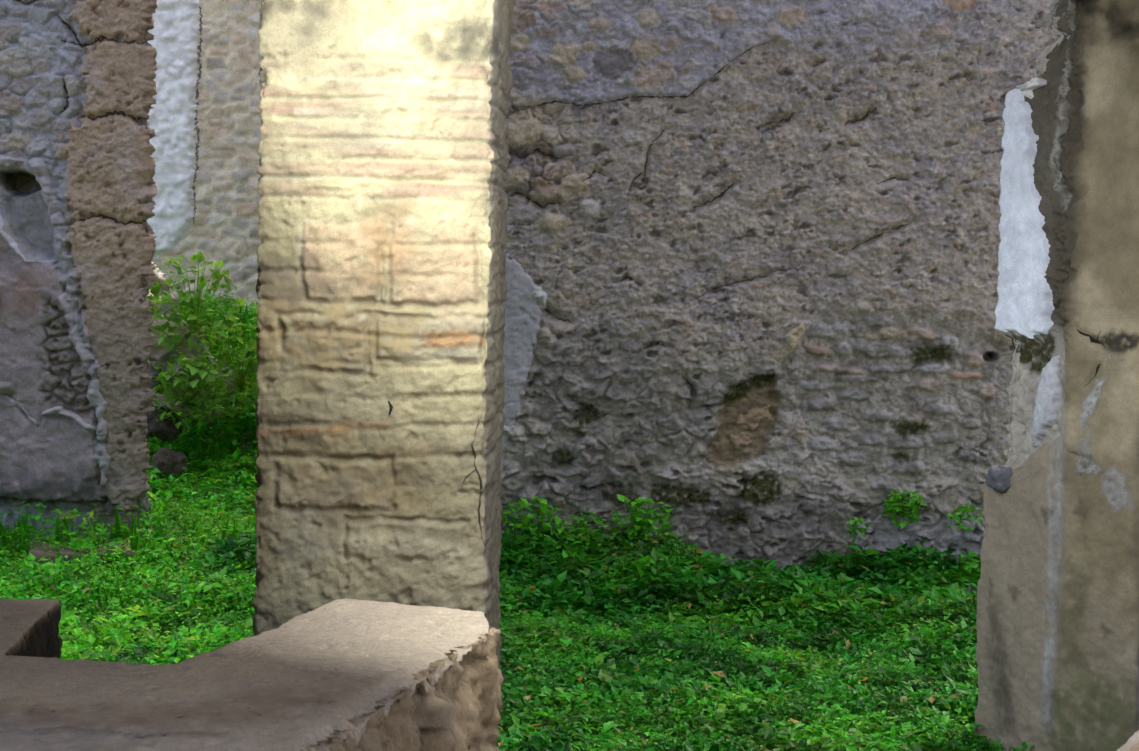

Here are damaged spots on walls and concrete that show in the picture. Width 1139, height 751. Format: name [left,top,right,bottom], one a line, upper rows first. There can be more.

crack [16,0,149,48]
crack [513,40,773,108]
crack [509,148,568,159]
crack [582,130,664,195]
crack [505,191,560,208]
crack [693,183,734,208]
flaking render [994,77,1055,339]
crack [697,265,800,298]
flaking render [0,153,111,486]
spalling [705,379,810,465]
crack [462,420,483,539]